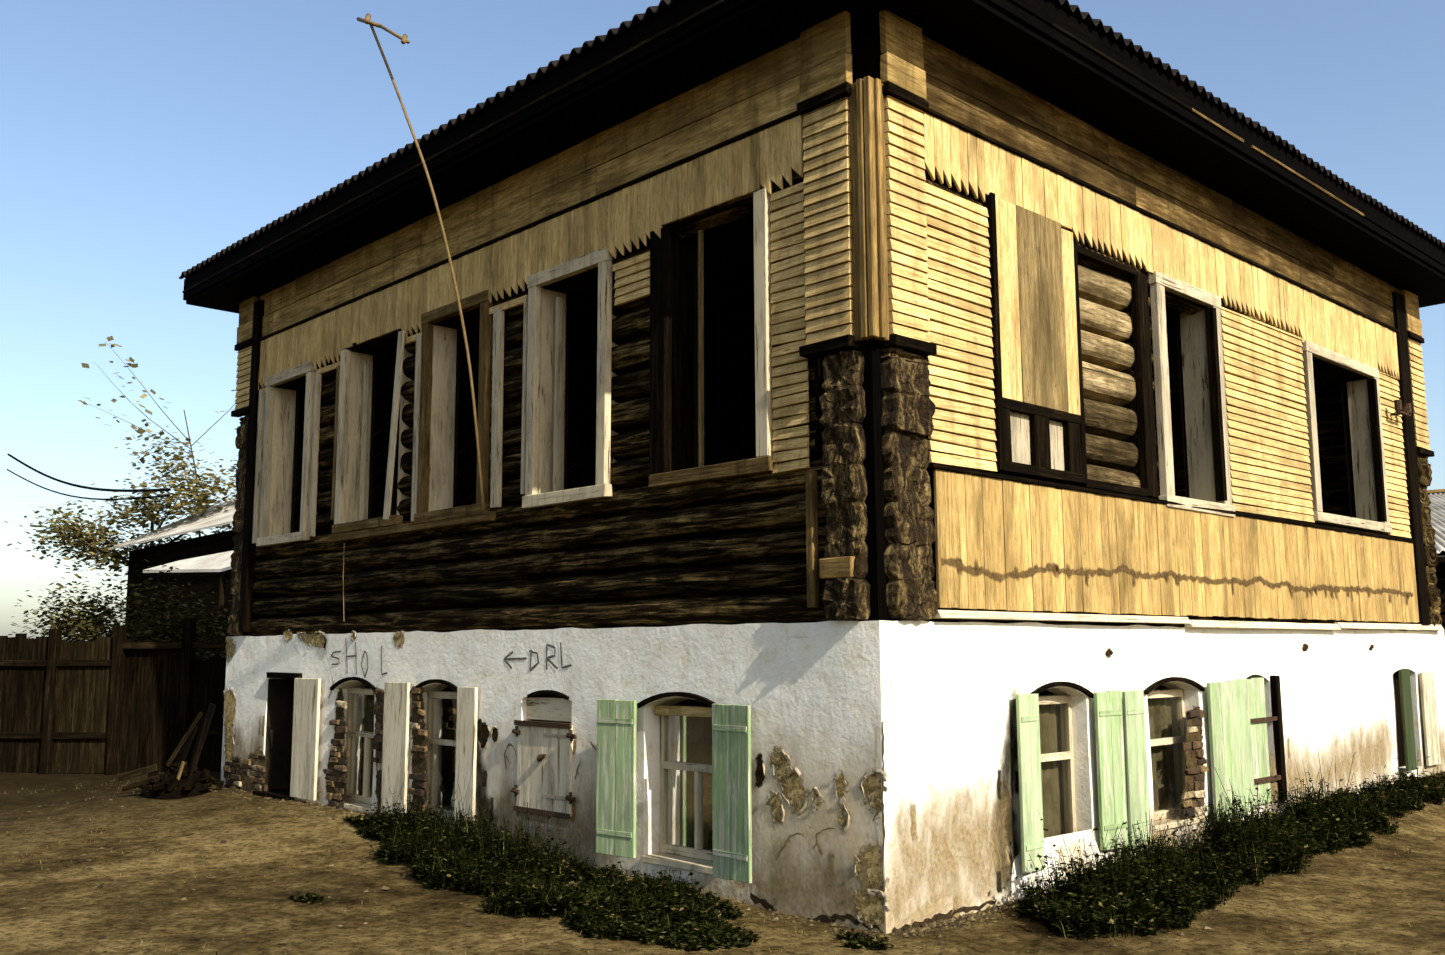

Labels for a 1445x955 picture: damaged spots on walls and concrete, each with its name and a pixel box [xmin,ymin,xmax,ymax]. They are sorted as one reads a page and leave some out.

peeling [283,629,327,652]
flaking render [223,686,268,792]
flaking render [323,687,350,809]
flaking render [372,685,384,814]
flaking render [408,684,429,818]
peeling [755,746,887,834]
leakage [895,695,1019,918]
flaking render [1178,705,1209,818]
peeling [853,842,890,933]